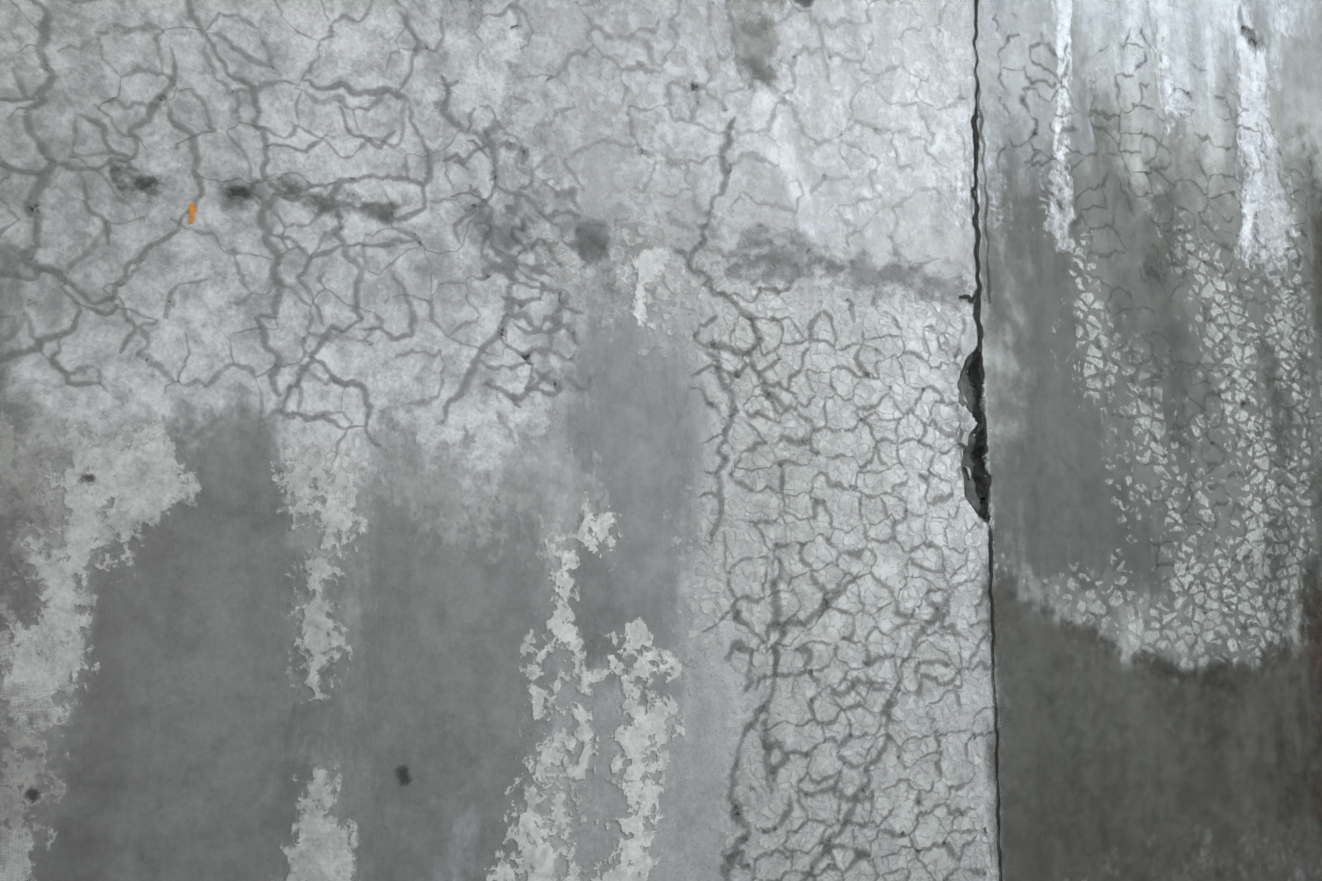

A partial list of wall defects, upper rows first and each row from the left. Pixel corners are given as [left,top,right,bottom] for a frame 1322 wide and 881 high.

crack [0,0,204,386]
crack [189,8,605,446]
leakage [0,0,992,881]
crack [959,0,1003,881]
leakage [683,235,1322,881]
leakage [1050,0,1312,256]